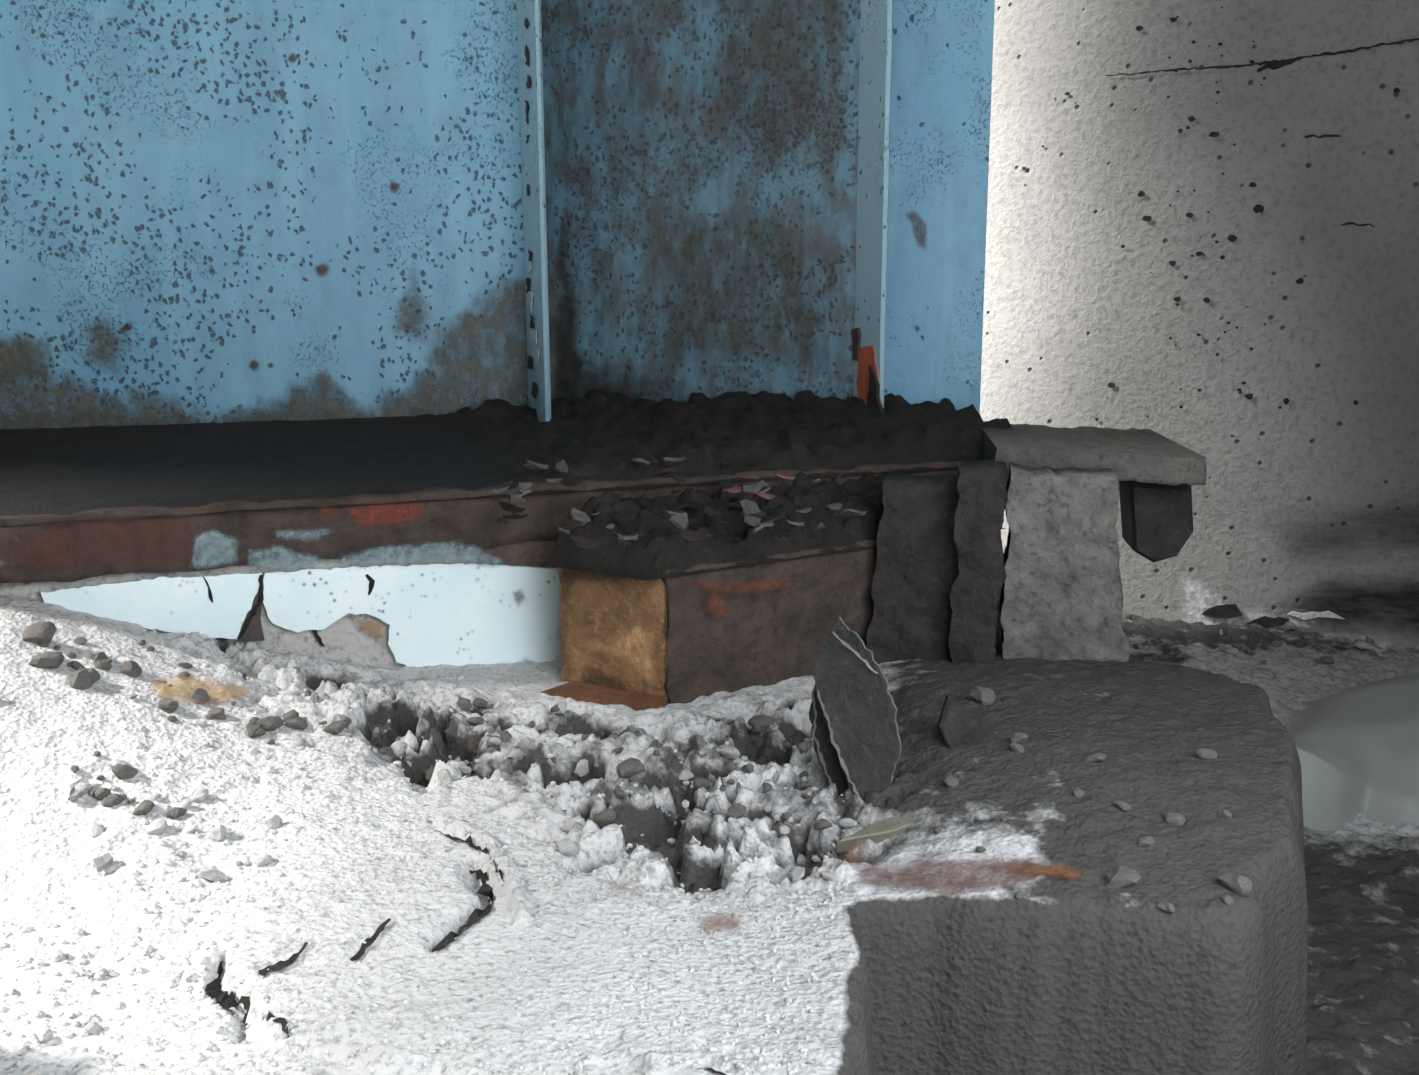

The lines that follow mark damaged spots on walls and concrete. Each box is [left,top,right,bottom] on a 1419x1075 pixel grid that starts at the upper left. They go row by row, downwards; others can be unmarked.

crack [1106,38,1419,76]
corrosion [0,341,206,429]
corrosion [91,323,131,362]
corrosion [224,281,528,422]
corrosion [549,346,560,396]
crack [203,576,213,603]
crack [238,573,265,642]
corrosion [477,540,624,601]
corrosion [590,626,654,680]